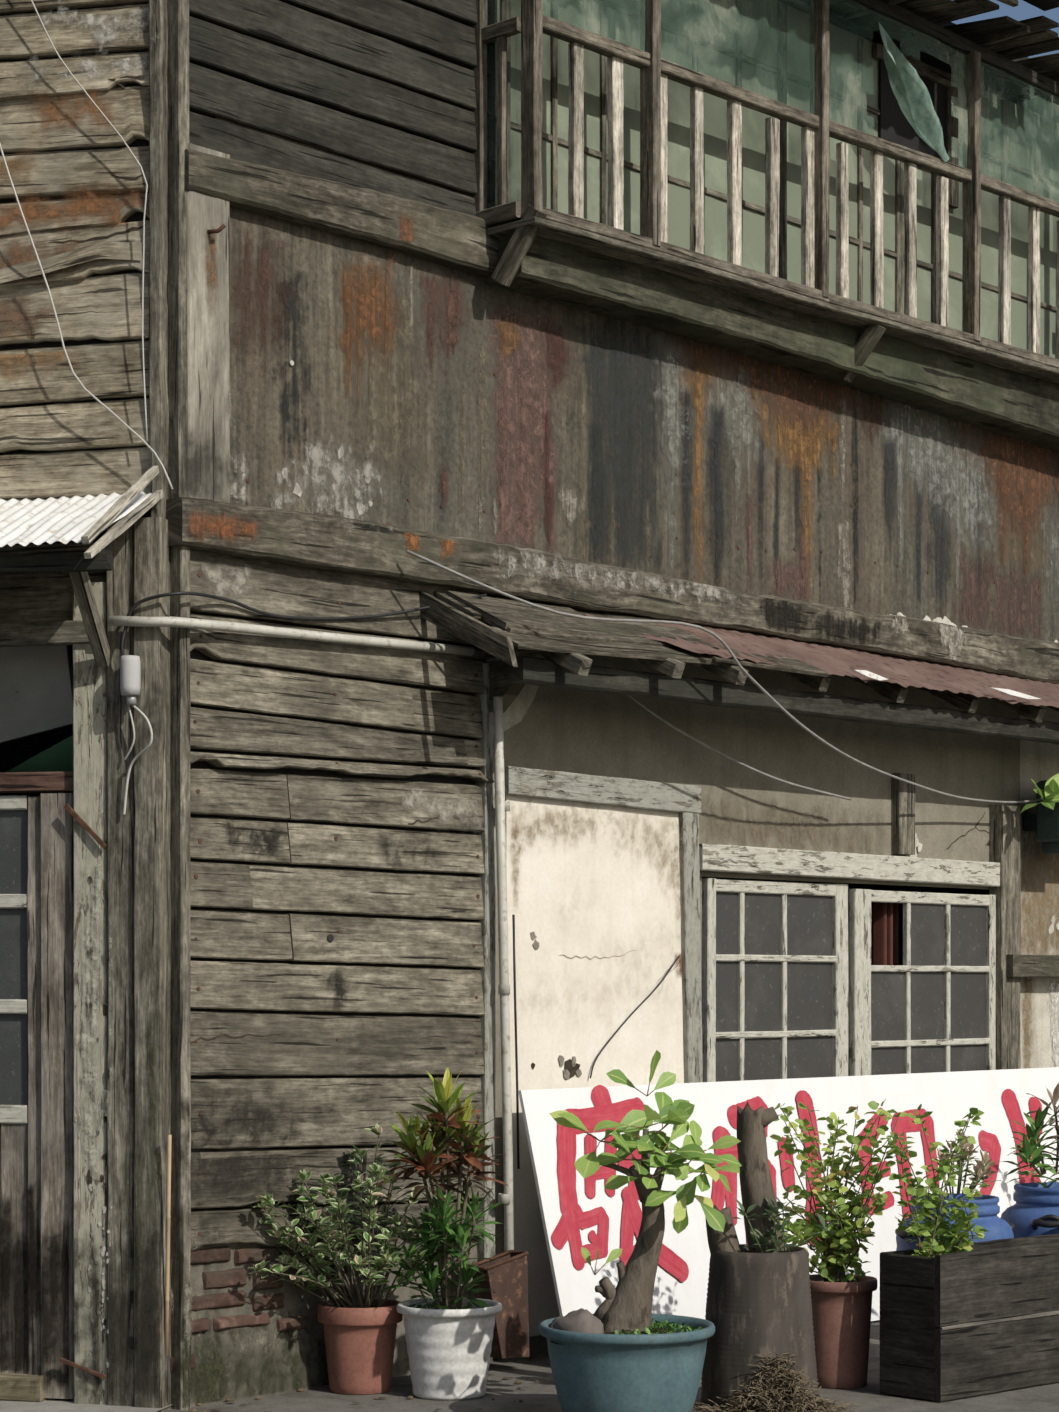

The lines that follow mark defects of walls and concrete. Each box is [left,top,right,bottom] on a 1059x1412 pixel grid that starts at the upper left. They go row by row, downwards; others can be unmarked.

corrosion [190,513,256,539]
peeling [274,440,382,522]
leakage [580,318,692,574]
corrosion [680,368,721,562]
leakage [707,375,881,643]
corrosion [755,393,837,585]
leakage [1021,810,1059,955]
leakage [1023,977,1033,1069]
leakage [0,1186,184,1405]